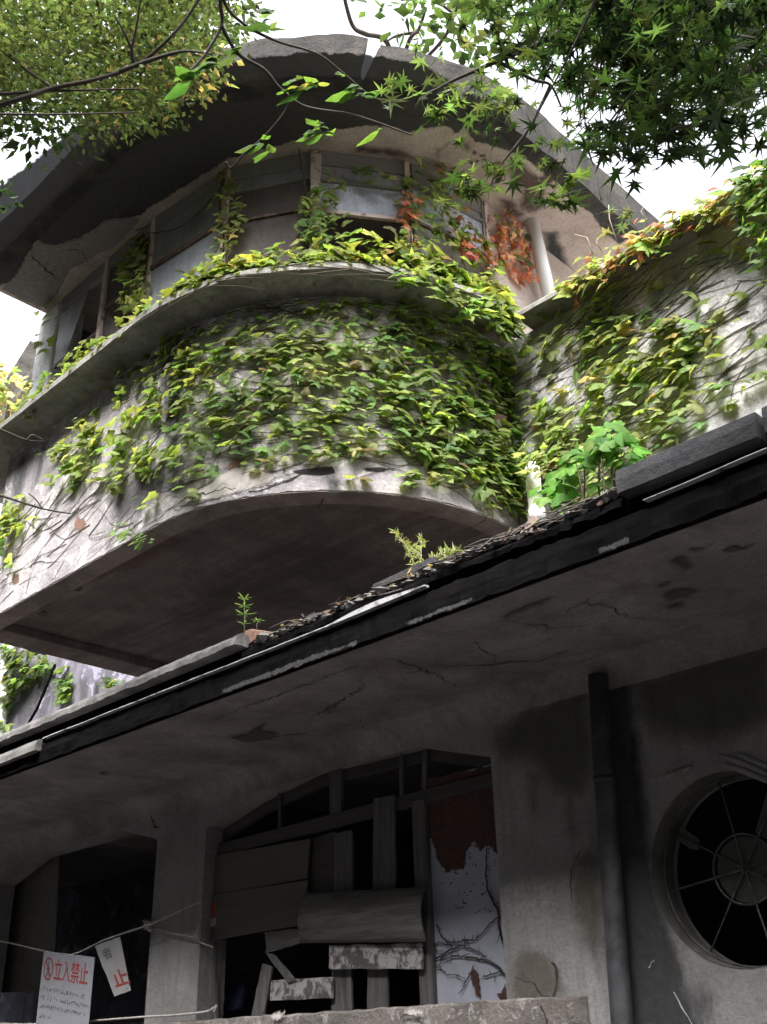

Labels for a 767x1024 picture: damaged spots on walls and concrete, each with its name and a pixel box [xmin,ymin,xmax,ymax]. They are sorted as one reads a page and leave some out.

crack [393,584,683,687]
crack [216,666,364,720]